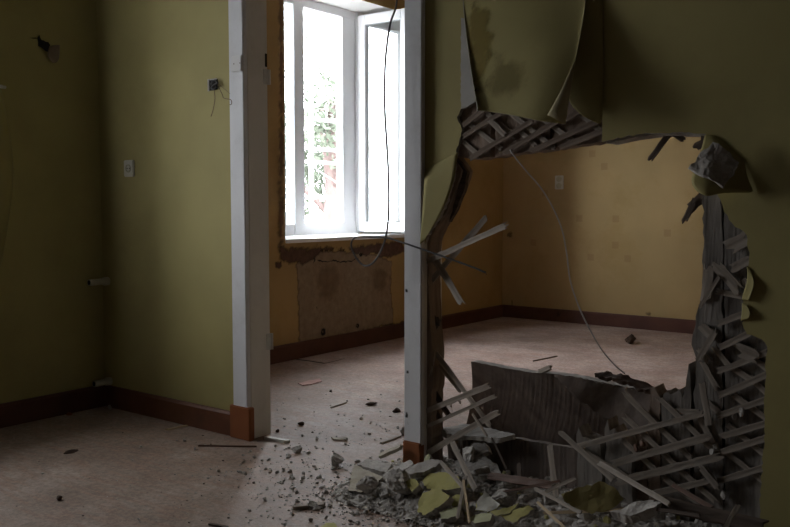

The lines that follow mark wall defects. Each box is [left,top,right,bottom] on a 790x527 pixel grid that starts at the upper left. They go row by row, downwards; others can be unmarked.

peeling [296,251,393,341]
flaking render [426,18,607,461]
flaking render [691,194,767,518]